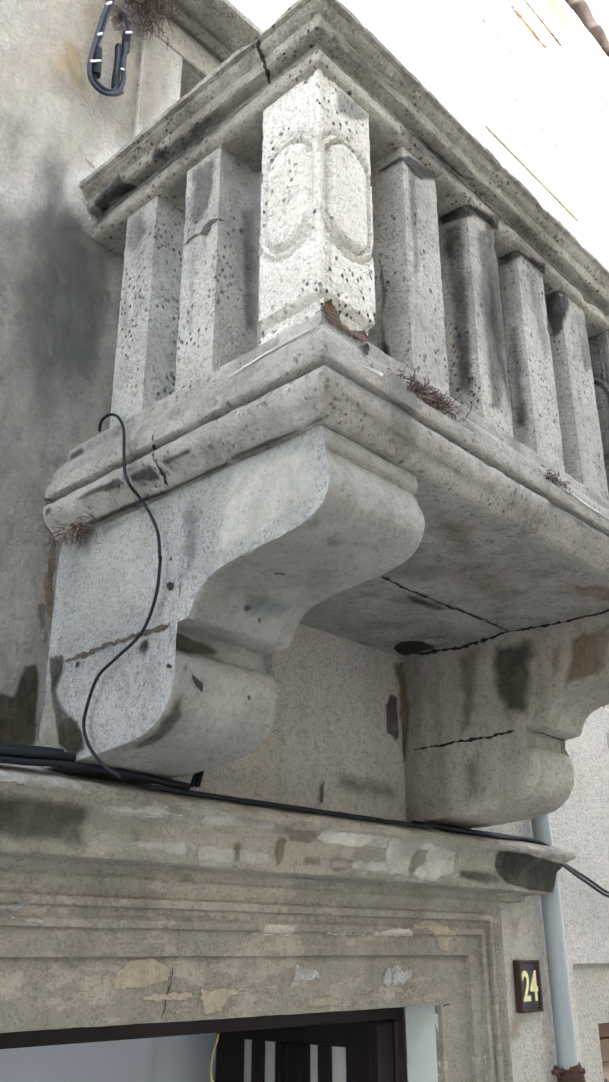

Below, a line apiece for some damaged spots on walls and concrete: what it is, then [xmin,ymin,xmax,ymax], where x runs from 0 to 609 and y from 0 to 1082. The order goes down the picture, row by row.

crack [255,34,271,84]
damp [153,148,166,159]
damp [94,175,136,212]
damp [31,199,94,377]
crack [382,576,609,655]
damp [568,630,607,682]
peeling [386,694,399,741]
crack [414,730,567,750]
peeling [254,914,295,936]
peeling [326,920,459,952]
peeling [110,958,267,1015]
peeling [382,965,429,1000]